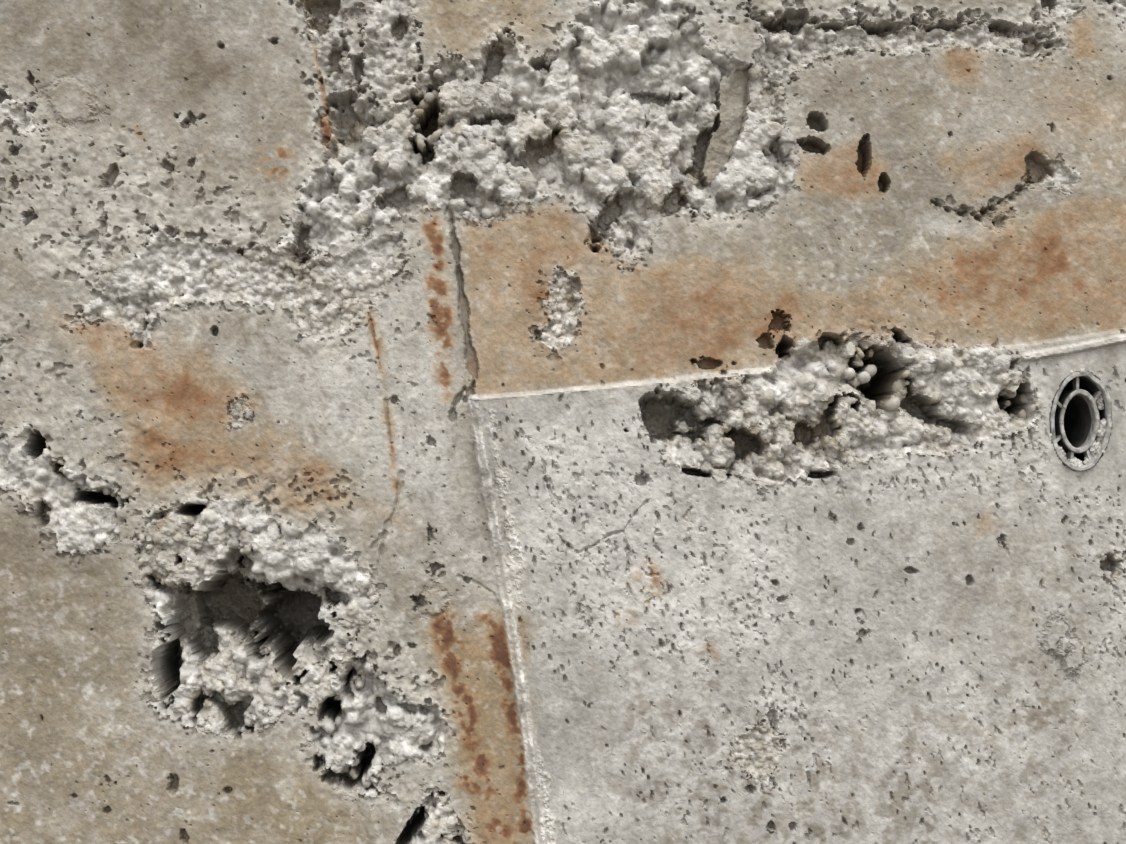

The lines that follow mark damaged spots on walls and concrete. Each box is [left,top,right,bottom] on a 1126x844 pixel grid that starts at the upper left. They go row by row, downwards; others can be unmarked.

crack [740,0,1058,46]
crack [442,211,482,424]
corrosion [418,126,1126,406]
crack [456,573,506,614]
corrosion [423,604,534,844]